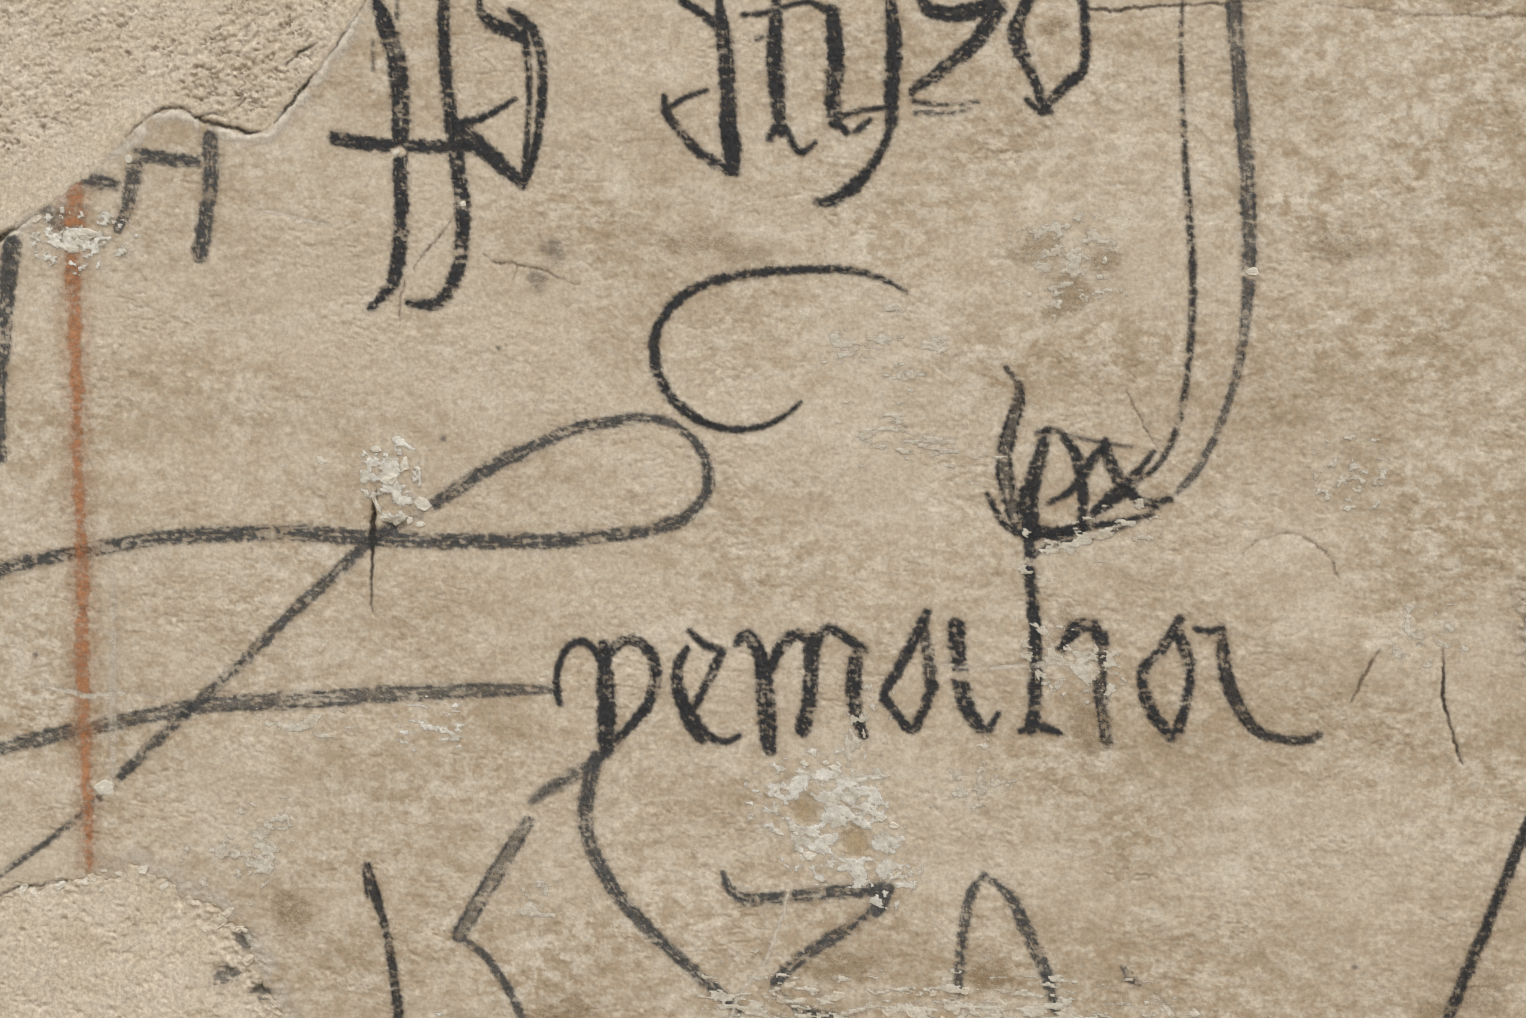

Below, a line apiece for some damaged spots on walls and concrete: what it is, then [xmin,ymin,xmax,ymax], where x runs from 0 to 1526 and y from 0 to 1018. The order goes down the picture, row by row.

crack [0,227,18,242]
corrosion [64,183,85,228]
peeling [63,228,99,253]
spalling [0,0,373,238]
corrosion [64,252,94,870]
peeling [360,436,432,529]
spalling [0,796,309,1018]
peeling [744,683,923,910]